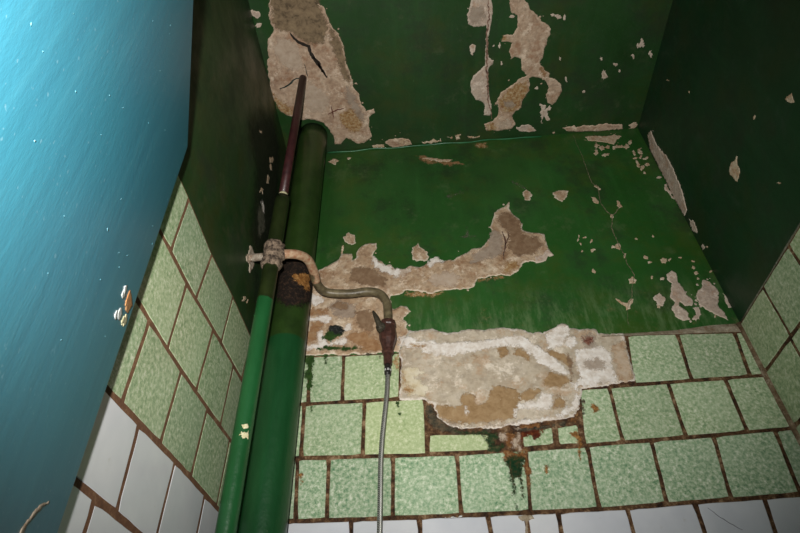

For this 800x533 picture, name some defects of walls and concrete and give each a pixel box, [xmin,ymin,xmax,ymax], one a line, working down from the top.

crack [280,33,327,89]
peeling [251,0,412,148]
peeling [422,0,562,144]
peeling [564,122,697,233]
peeling [729,156,740,181]
flaking render [305,202,635,430]
peeling [653,270,731,323]
damp [423,403,581,533]
corrosion [519,422,550,450]